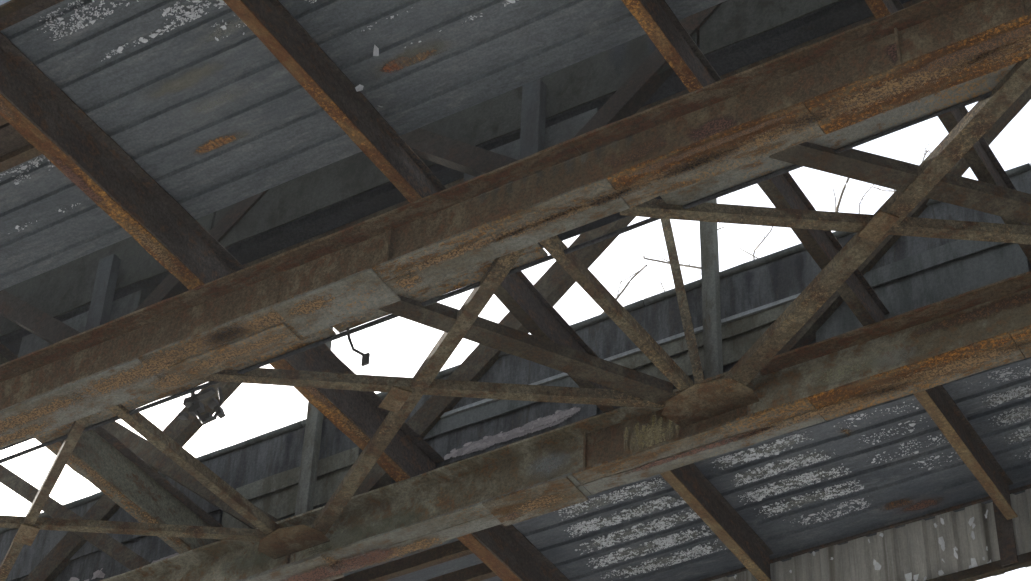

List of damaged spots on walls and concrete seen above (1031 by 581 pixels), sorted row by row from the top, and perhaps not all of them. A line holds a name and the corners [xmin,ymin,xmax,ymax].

rust [391,23,1031,292]
rust [625,336,1031,474]